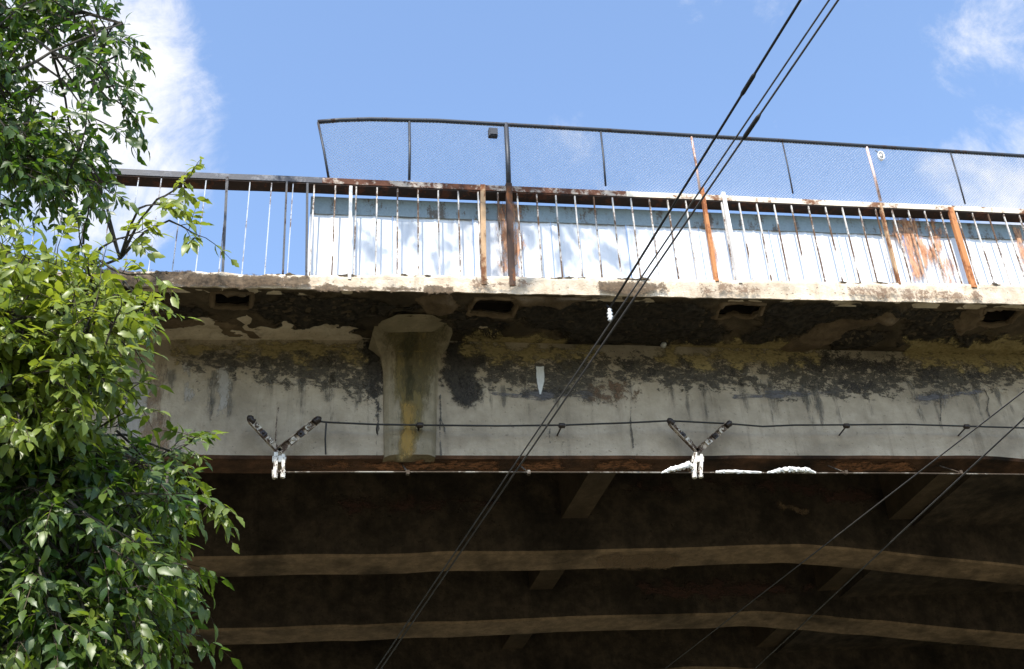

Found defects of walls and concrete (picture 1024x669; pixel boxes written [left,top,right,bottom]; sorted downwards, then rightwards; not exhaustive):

corrosion [496,201,526,276]
corrosion [892,218,957,284]
spalling [151,318,261,339]
damp [167,316,1024,460]